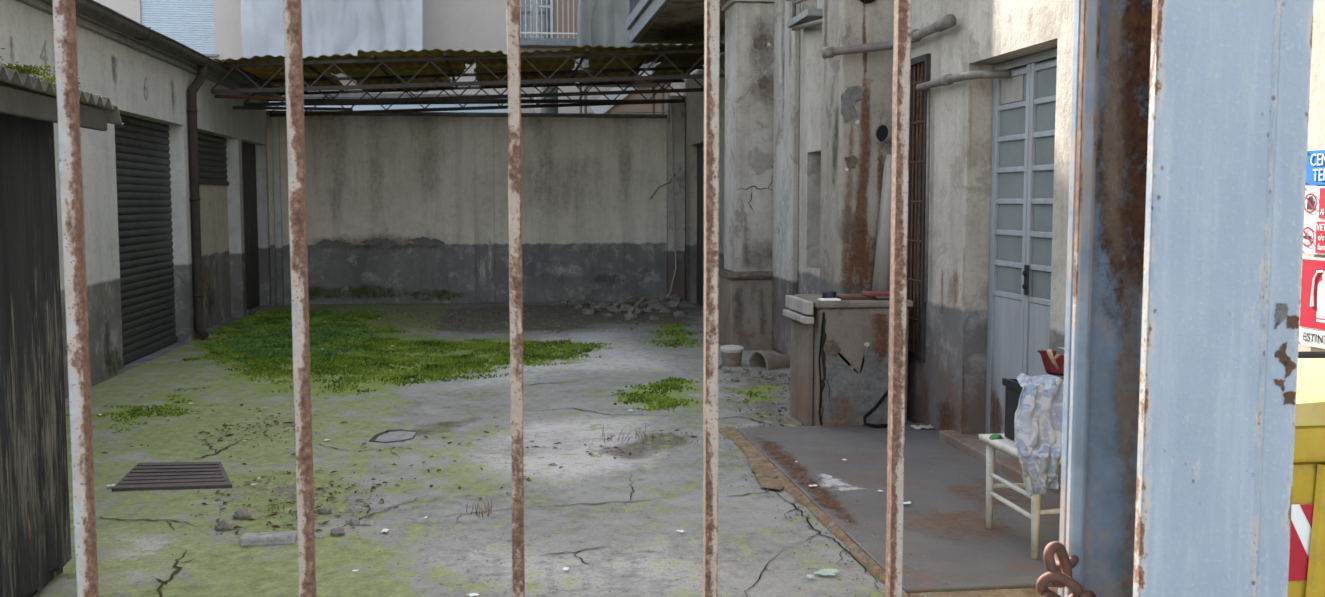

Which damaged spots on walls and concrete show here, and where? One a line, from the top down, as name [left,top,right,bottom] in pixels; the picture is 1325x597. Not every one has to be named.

spalling [841,85,863,125]
corrosion [842,3,883,294]
corrosion [1096,0,1153,597]
peeling [824,339,889,425]
peeling [1274,303,1300,405]
crack [99,516,197,597]
crack [342,475,879,597]